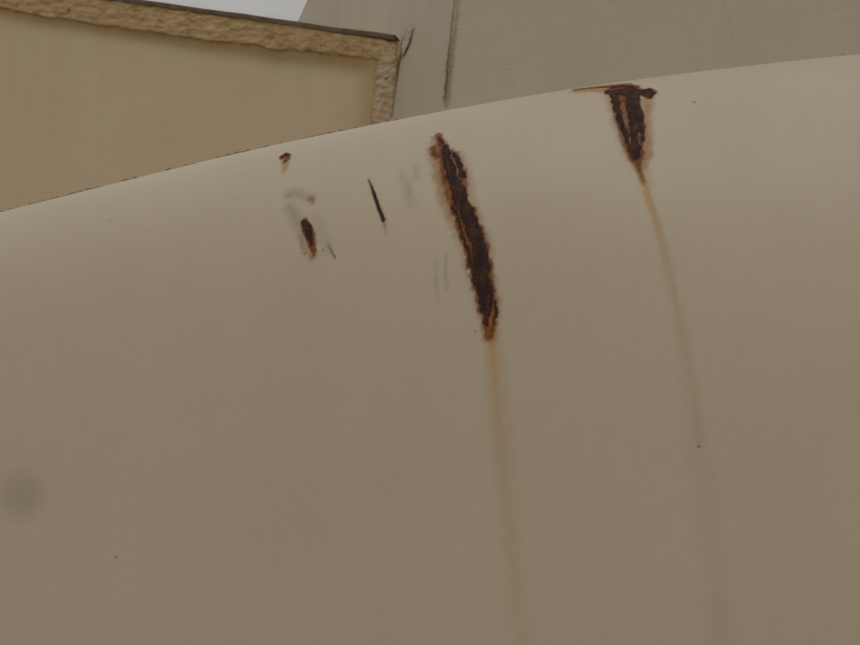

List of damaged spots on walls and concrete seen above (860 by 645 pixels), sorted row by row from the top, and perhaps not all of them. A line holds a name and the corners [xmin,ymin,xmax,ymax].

rust [573,83,657,210]
rust [301,219,317,259]
rust [431,133,498,340]